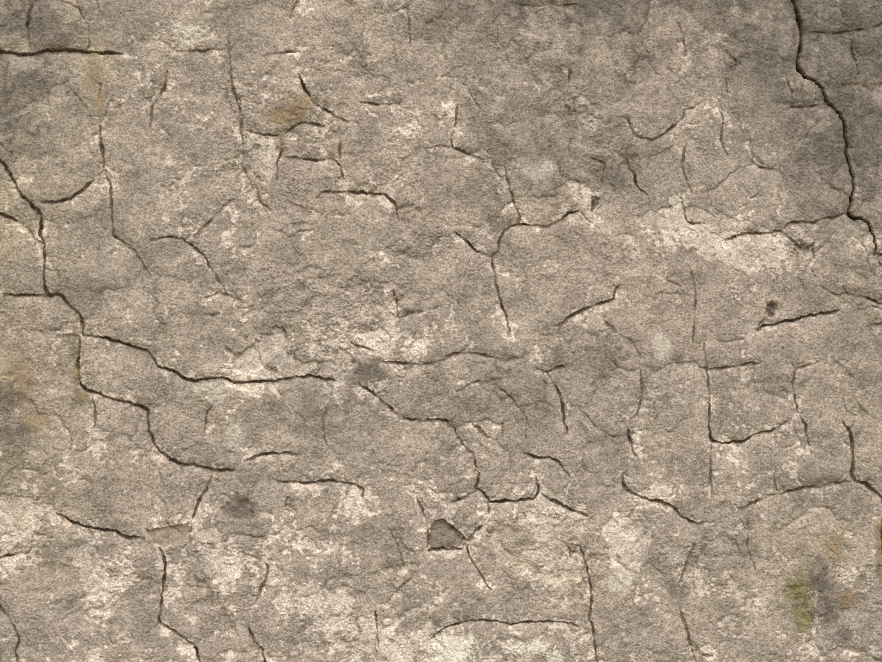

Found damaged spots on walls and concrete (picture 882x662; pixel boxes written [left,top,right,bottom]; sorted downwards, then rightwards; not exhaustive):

crack [0,0,123,57]
crack [0,125,335,531]
crack [149,41,402,221]
crack [426,106,648,332]
crack [538,286,644,456]
crack [668,268,819,495]
crack [719,0,882,266]
crack [756,285,882,331]
crack [350,341,588,647]
crack [741,396,882,570]
crack [56,513,202,662]
crack [432,543,599,662]